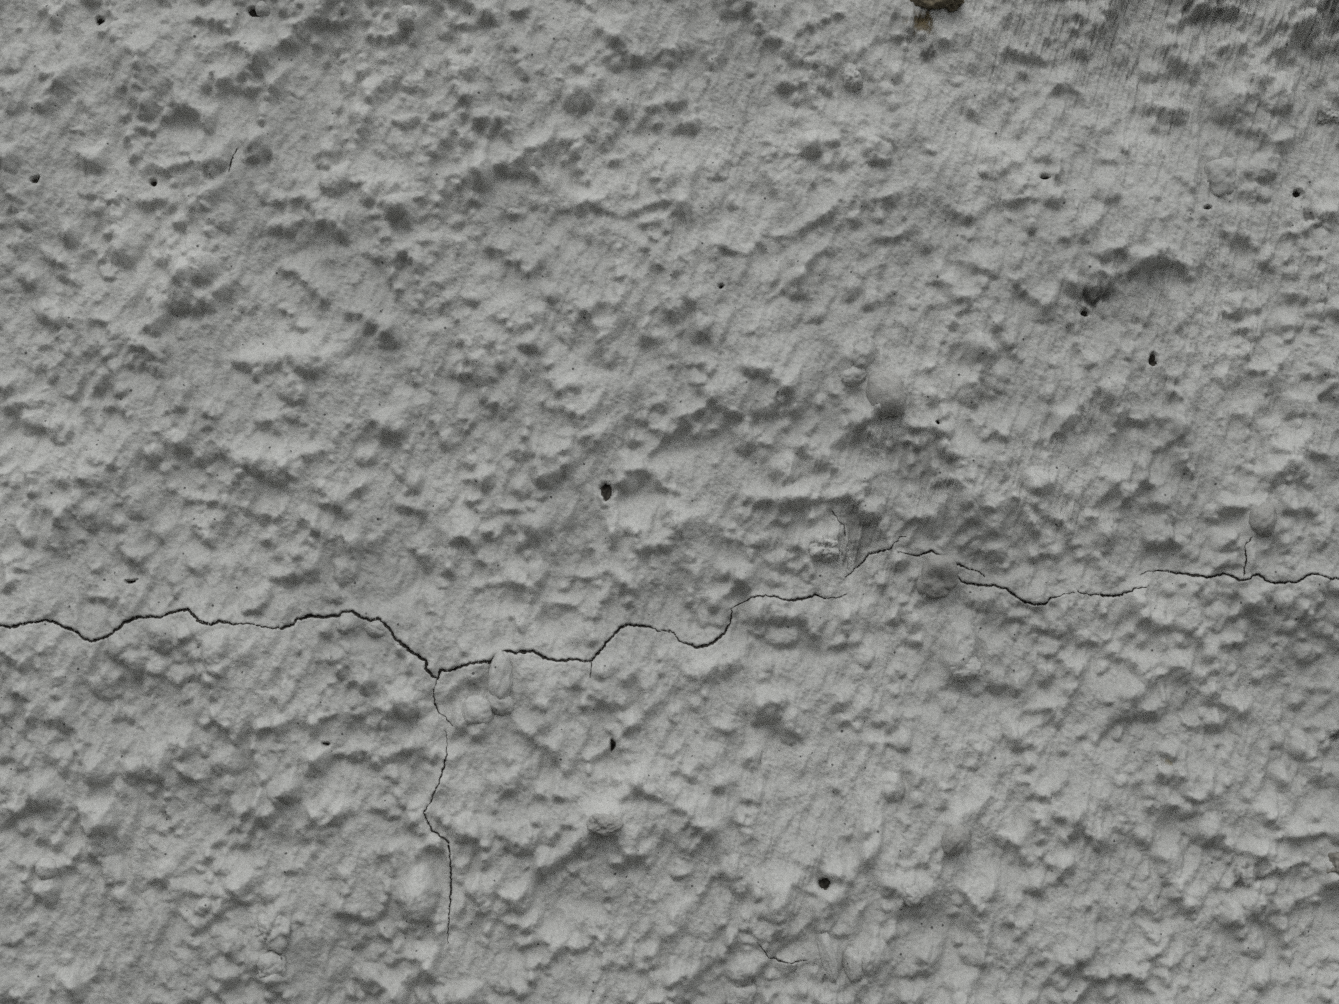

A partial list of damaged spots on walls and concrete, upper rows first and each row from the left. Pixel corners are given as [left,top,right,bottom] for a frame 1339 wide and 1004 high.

crack [0,511,1339,943]